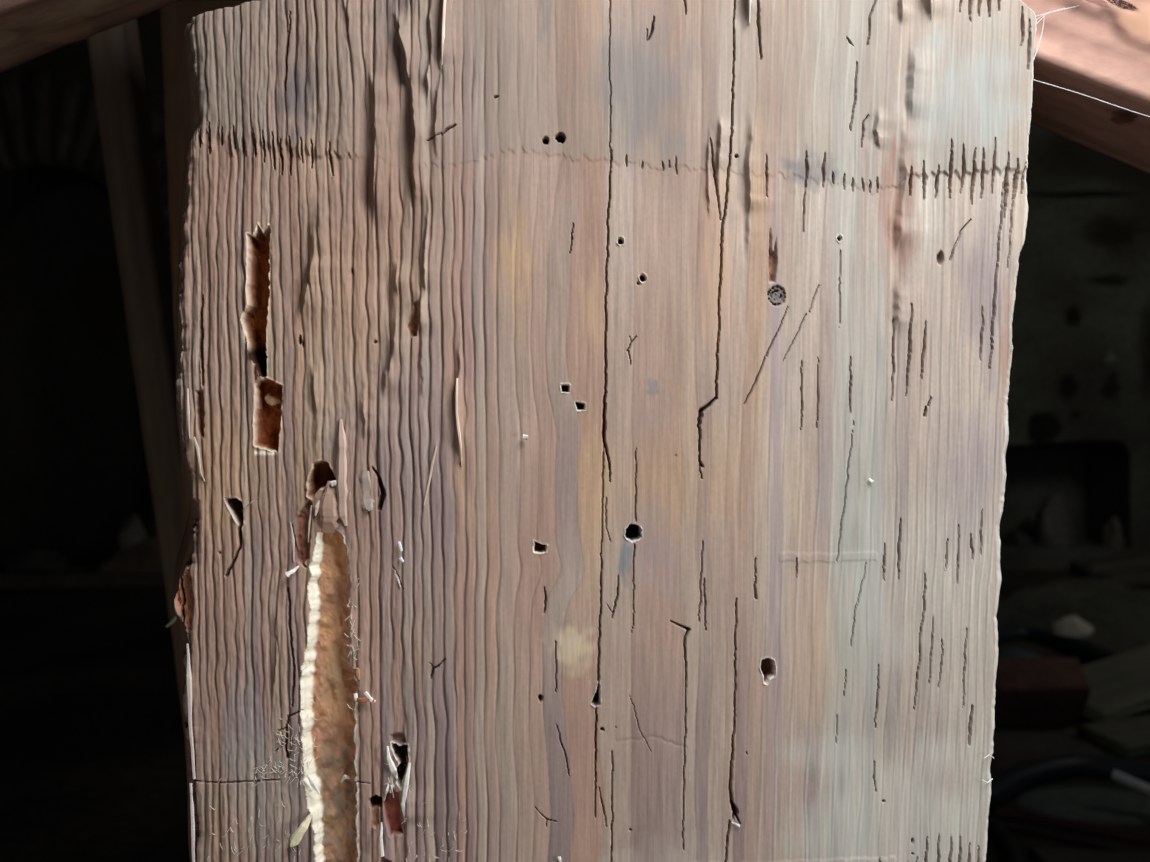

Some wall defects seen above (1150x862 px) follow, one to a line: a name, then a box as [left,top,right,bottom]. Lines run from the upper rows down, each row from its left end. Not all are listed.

crack [845,0,877,149]
crack [697,0,842,479]
crack [555,0,637,862]
crack [891,303,932,418]
crack [541,587,549,615]
crack [552,641,560,693]
crack [629,694,652,752]
crack [670,540,707,851]
crack [724,557,757,862]
crack [792,557,800,579]
crack [870,760,878,792]
crack [834,356,983,746]